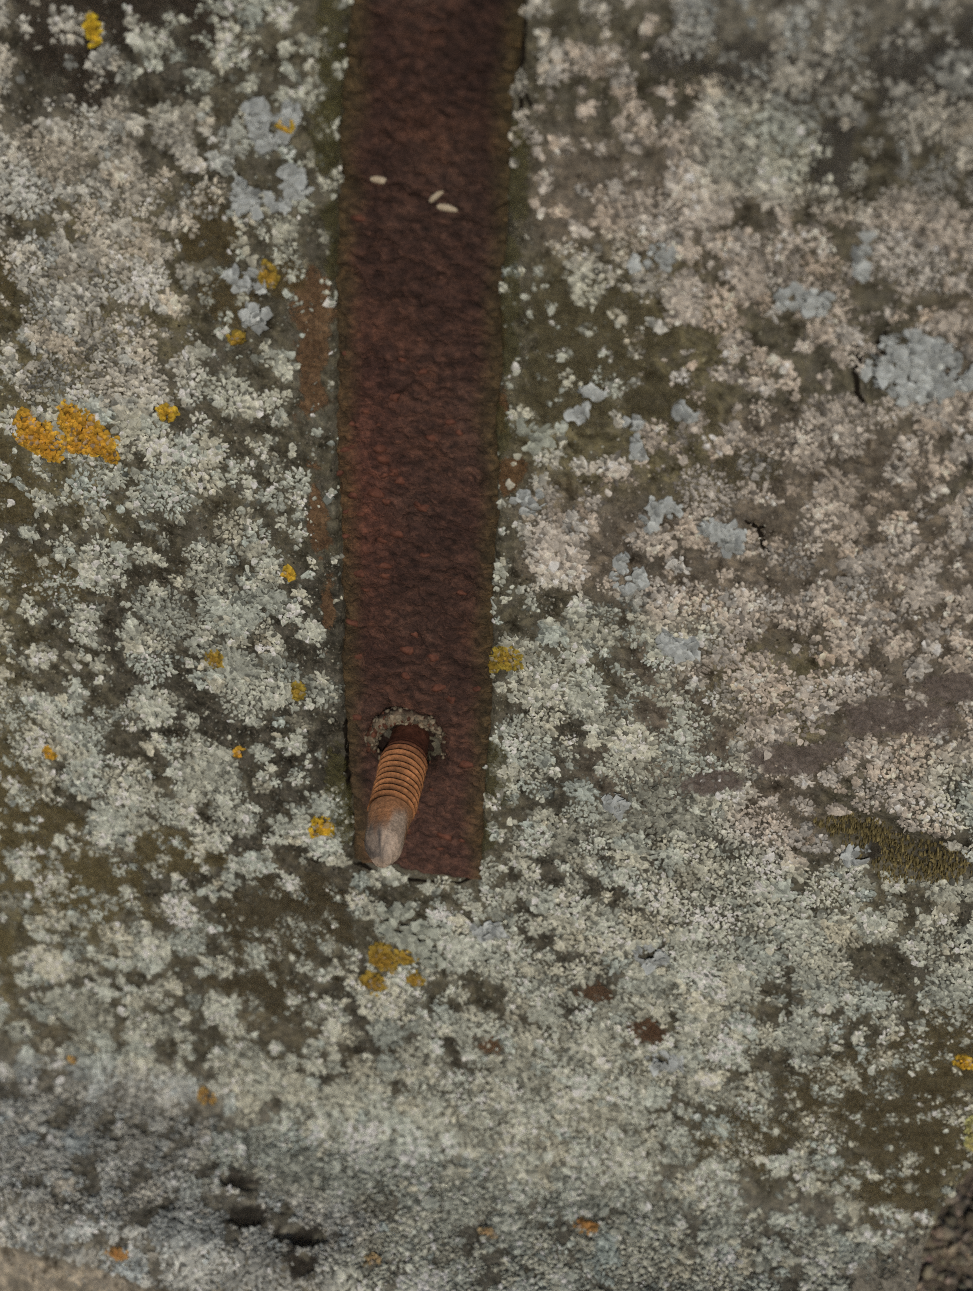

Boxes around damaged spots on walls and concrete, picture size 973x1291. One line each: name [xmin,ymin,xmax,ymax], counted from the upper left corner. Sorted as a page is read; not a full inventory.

corrosion [496,388,508,433]
corrosion [499,457,527,496]